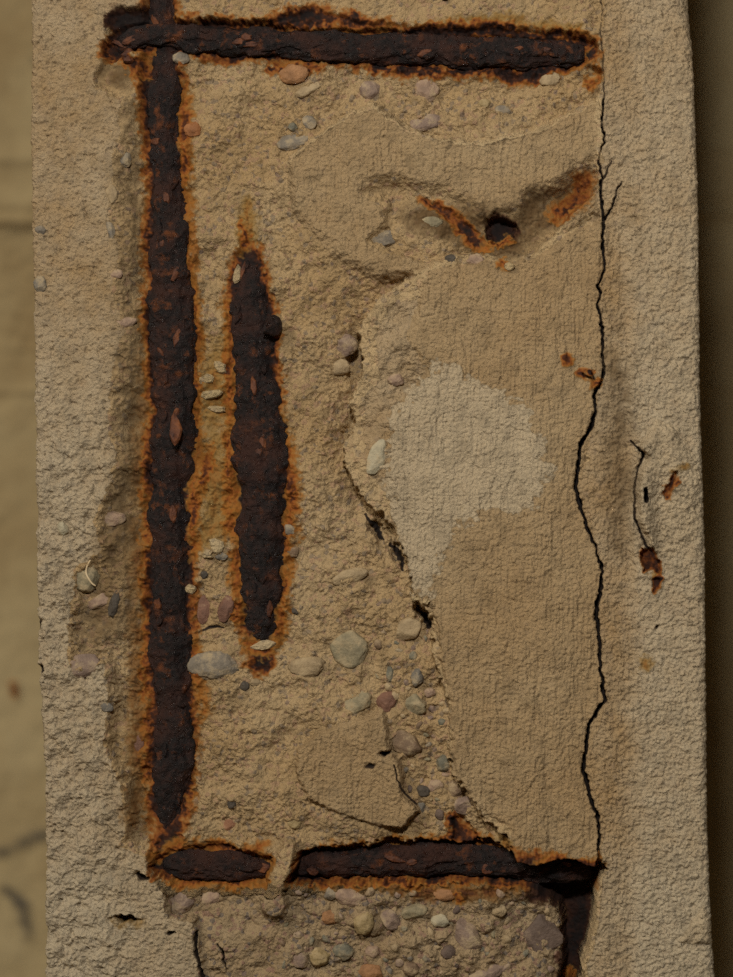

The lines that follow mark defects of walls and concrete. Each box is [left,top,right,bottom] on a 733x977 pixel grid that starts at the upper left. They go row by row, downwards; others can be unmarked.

corrosion [96,0,276,893]
spalling [66,0,608,977]
corrosion [173,0,603,680]
corrosion [284,810,606,977]
crack [574,0,622,858]
crack [630,440,651,549]